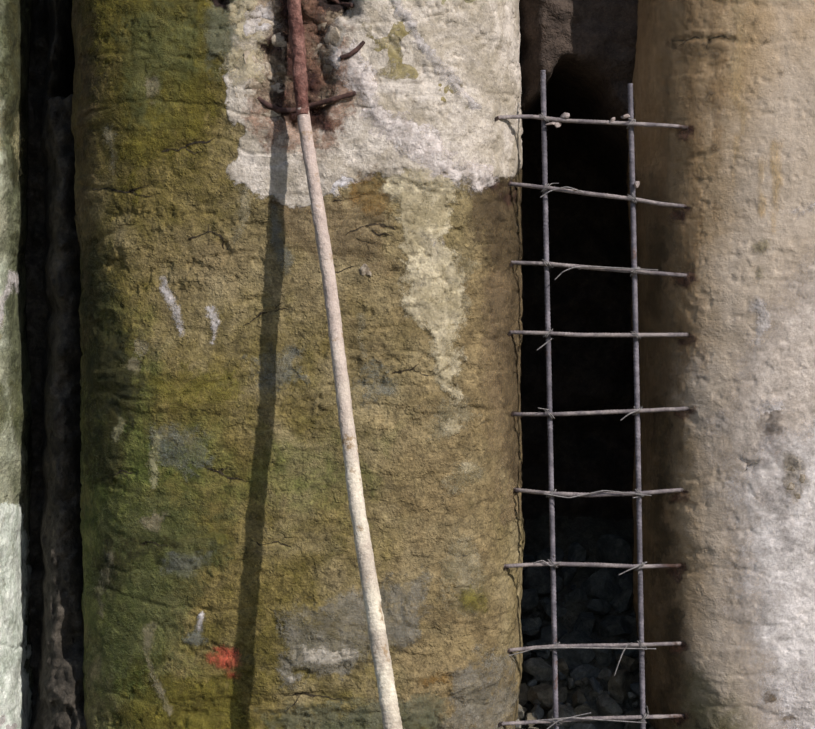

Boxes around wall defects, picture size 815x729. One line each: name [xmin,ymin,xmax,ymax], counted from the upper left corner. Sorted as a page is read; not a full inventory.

rust [287,0,309,117]
spalling [340,41,365,60]
spalling [257,96,296,113]
spalling [309,91,356,109]